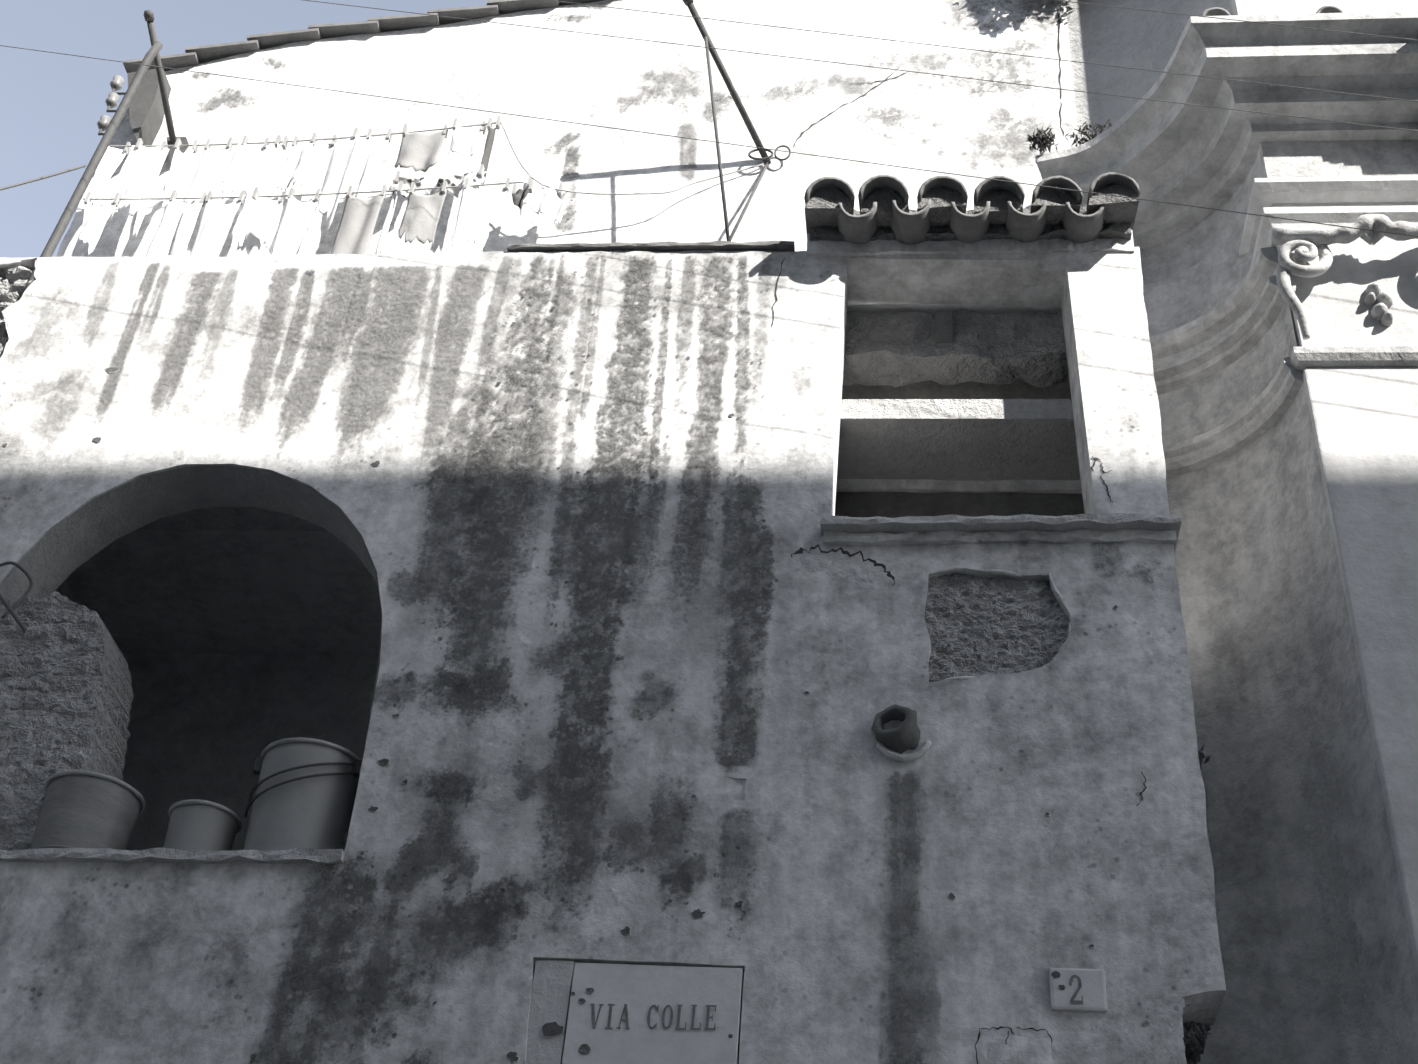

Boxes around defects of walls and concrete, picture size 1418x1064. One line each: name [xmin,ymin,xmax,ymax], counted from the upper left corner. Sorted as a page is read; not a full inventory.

water stain [547,132,582,230]
spalling [0,260,37,358]
water stain [98,263,169,413]
water stain [152,272,221,409]
water stain [240,255,777,1064]
crack [791,544,895,586]
spalling [924,566,1071,683]
water stain [880,772,941,1064]